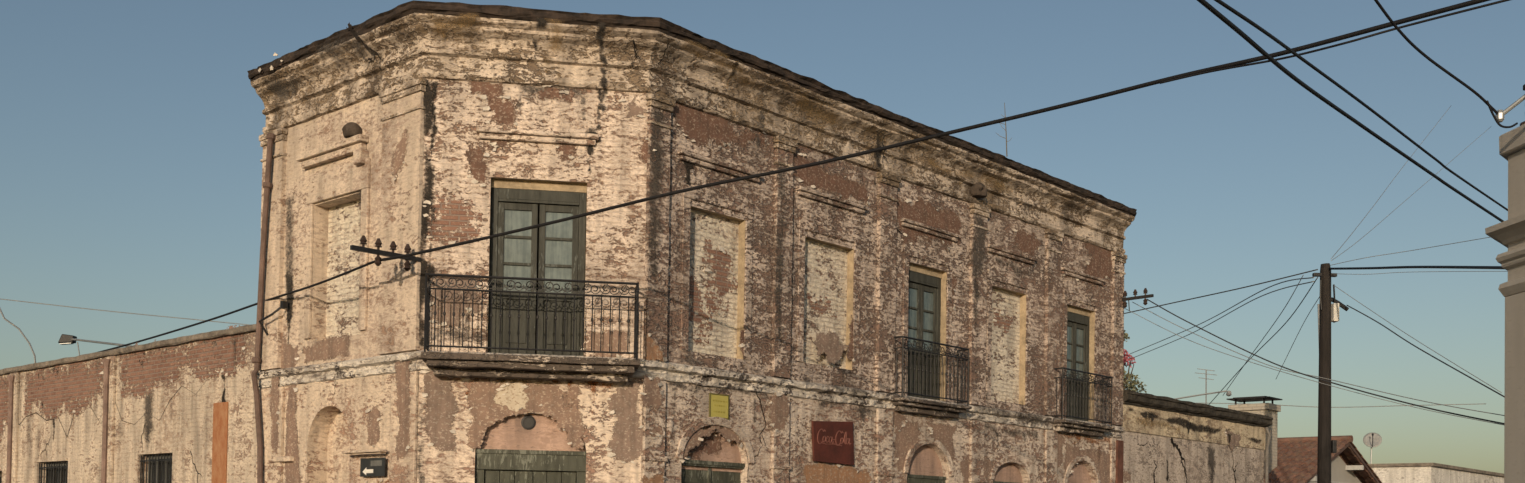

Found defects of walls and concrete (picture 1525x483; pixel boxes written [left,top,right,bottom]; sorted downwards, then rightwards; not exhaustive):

leakage [419,81,438,346]
flaking render [422,81,518,250]
leakage [446,315,485,342]
flaking render [689,238,738,346]
flaking render [0,325,255,443]
flaking render [264,335,350,483]
flaking render [365,360,585,461]
flaking render [581,328,667,483]
flaking render [679,425,748,463]
flaking render [803,462,872,483]
flaking render [889,409,994,483]
crack [1137,438,1187,483]